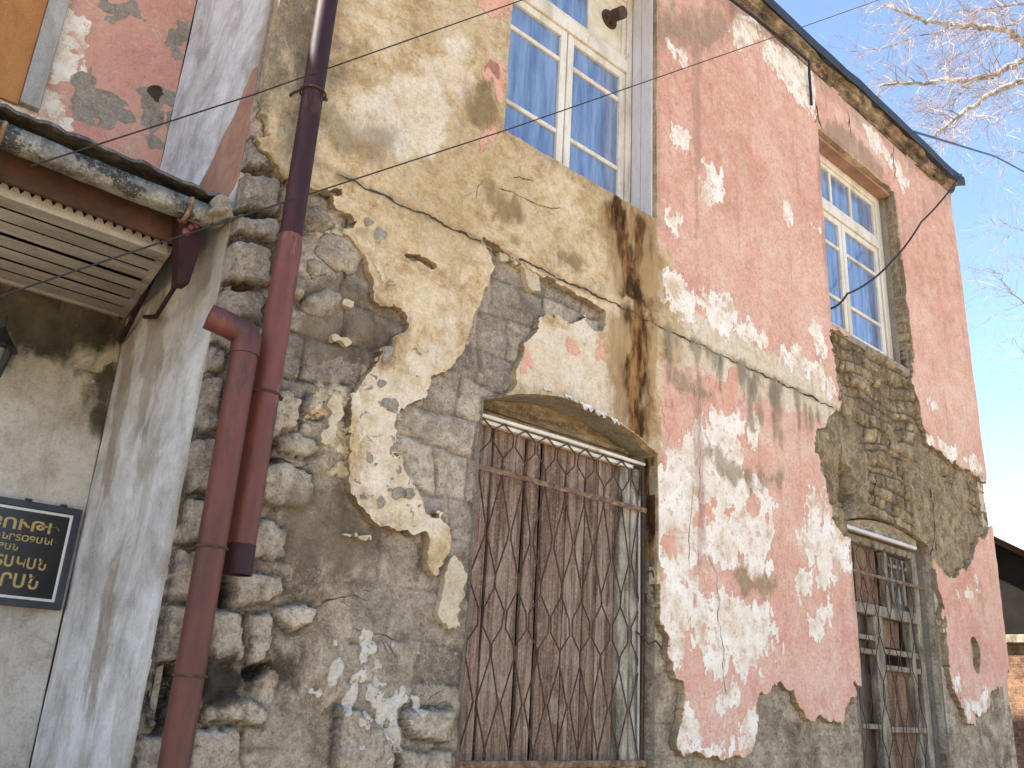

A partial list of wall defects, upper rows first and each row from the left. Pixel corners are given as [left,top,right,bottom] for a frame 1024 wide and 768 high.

peeling [0,0,176,150]
peeling [728,13,820,119]
damp [0,283,127,361]
damp [77,361,115,436]
flaking render [131,332,231,768]
flaking render [190,192,606,768]
crack [338,174,834,408]
rust [602,195,662,441]
damp [692,338,724,380]
damp [738,361,782,441]
damp [795,390,842,439]
flaking render [643,186,1018,768]